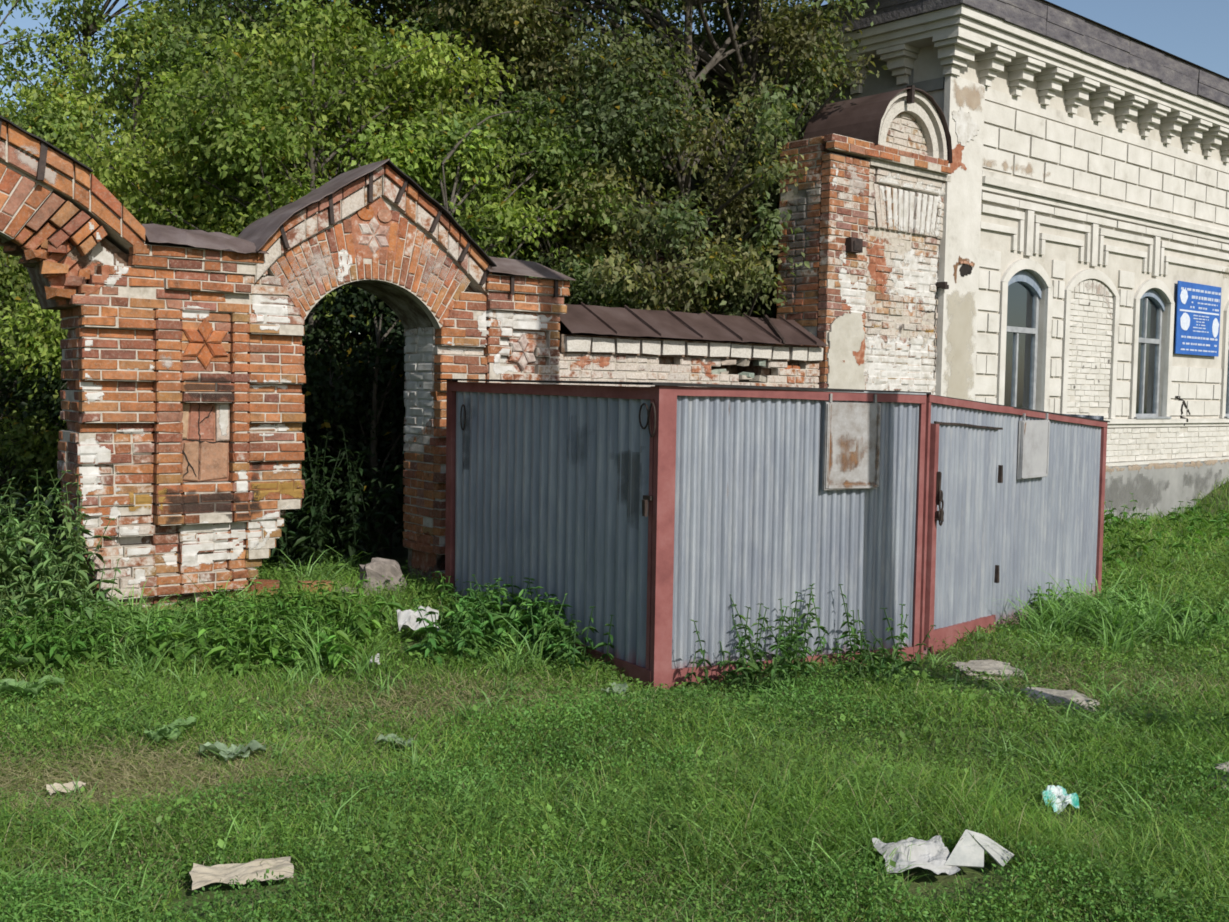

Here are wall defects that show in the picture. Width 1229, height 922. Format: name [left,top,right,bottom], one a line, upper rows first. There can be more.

flaking render [984,161,1032,173]
peeling [832,143,967,316]
flaking render [571,355,612,376]
flaking render [693,359,766,382]
peeling [843,331,937,395]
peeling [78,438,289,585]
peeling [272,463,300,473]
leakage [617,452,640,516]
rust [828,417,876,487]